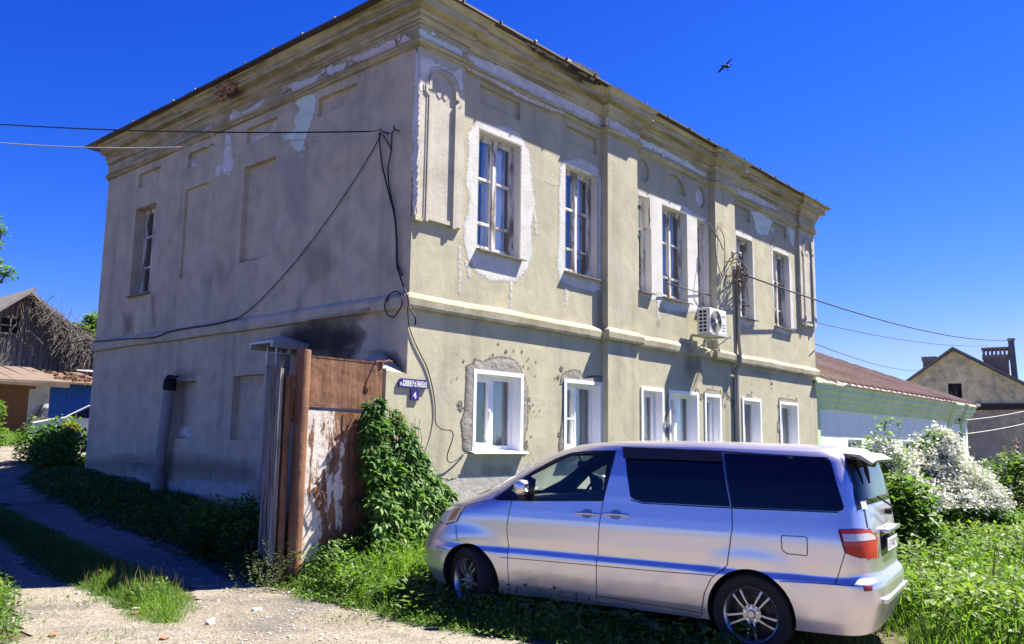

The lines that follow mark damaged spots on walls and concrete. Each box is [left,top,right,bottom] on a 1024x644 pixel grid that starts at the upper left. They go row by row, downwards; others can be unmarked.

flaking render [204,98,265,180]
flaking render [249,28,706,215]
flaking render [736,187,777,236]
spalling [441,350,543,504]
spalling [557,366,602,452]